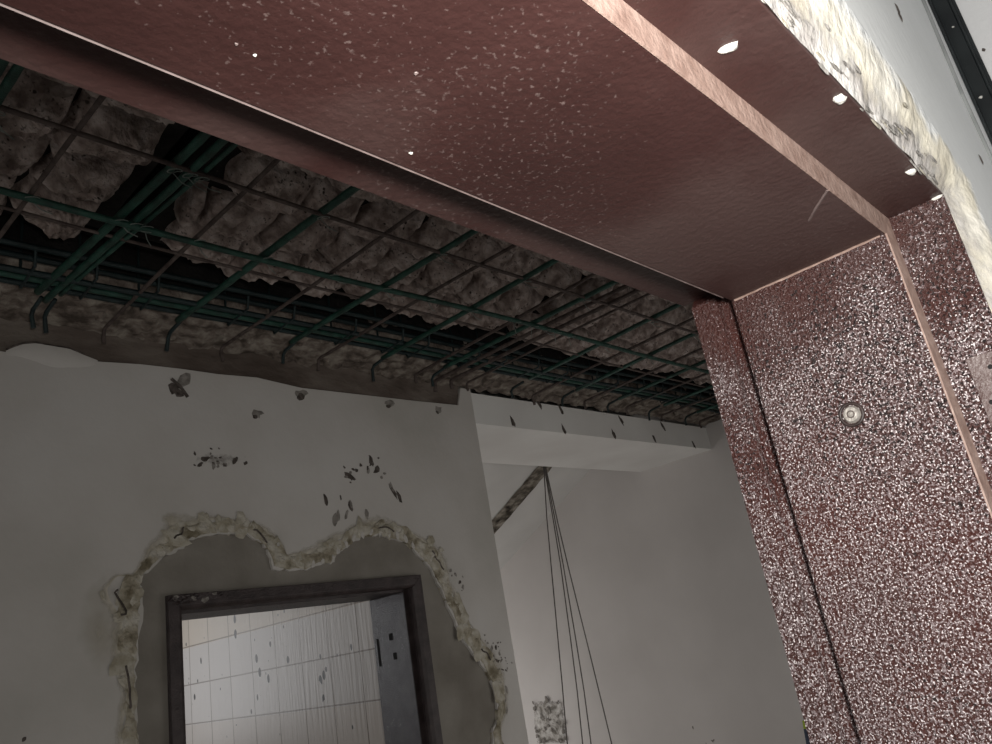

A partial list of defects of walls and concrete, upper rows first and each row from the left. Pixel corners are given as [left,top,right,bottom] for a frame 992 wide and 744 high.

peeling [0,59,721,428]
peeling [193,447,247,470]
peeling [343,455,402,503]
spalling [492,466,552,534]
flaking render [100,494,513,744]